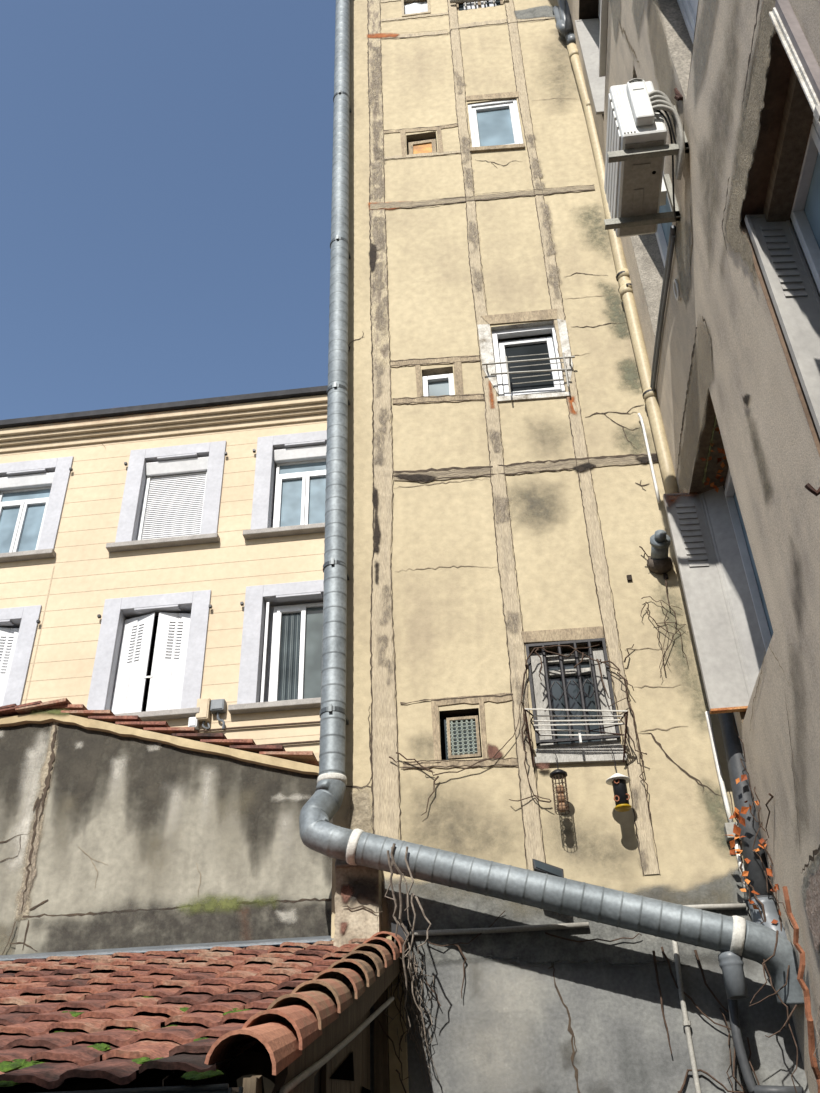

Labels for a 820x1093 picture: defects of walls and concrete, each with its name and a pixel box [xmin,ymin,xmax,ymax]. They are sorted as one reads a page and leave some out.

peeling [368,47,384,198]
peeling [369,217,387,330]
peeling [373,409,389,465]
leakage [0,722,318,867]
spalling [801,844,820,954]
crack [548,963,580,1093]